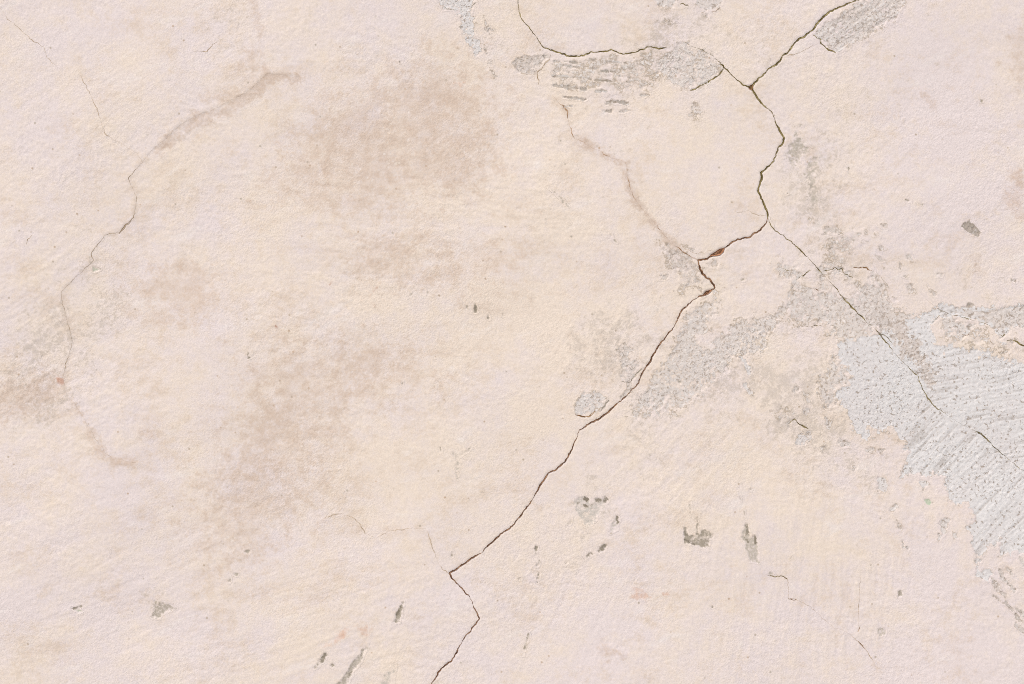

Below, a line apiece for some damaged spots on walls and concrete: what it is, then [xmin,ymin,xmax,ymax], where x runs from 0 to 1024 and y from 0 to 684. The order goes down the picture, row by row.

spalling [510,50,565,78]
peeling [652,0,726,128]
crack [329,0,1024,684]
peeling [613,213,1024,636]